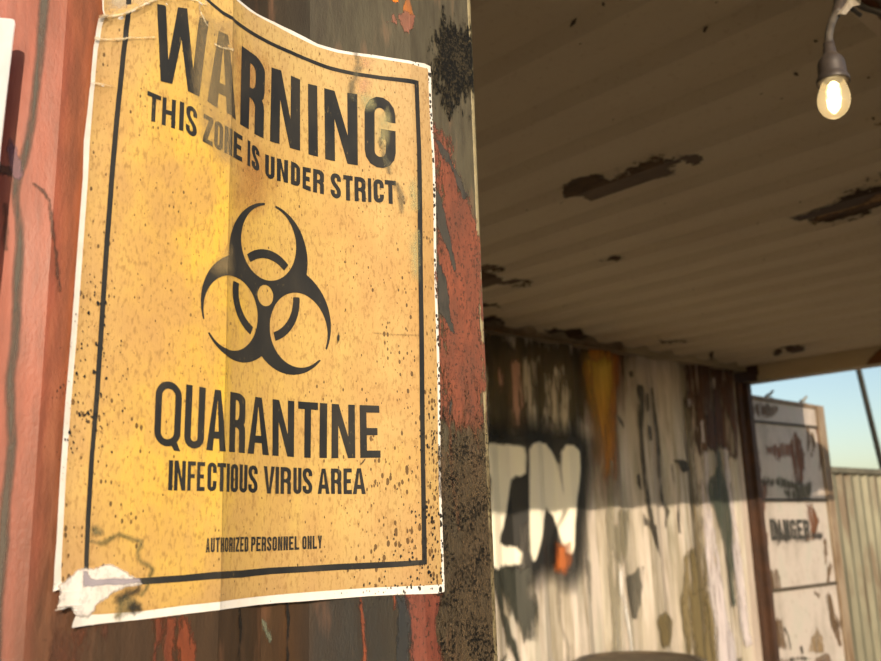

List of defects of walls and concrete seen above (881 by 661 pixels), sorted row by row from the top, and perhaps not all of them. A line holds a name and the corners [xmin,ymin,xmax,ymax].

peeling [392,0,415,33]
peeling [560,154,703,203]
peeling [481,264,532,288]
peeling [483,303,505,324]
corrosion [433,123,624,478]
peeling [544,328,589,339]